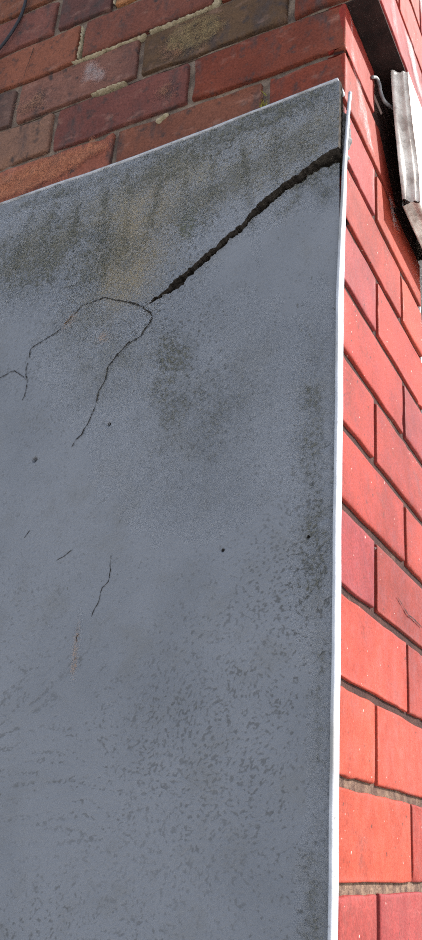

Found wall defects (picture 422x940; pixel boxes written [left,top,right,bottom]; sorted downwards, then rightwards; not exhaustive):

water stain [120,87,334,220]
water stain [0,187,131,291]
crack [0,297,152,446]